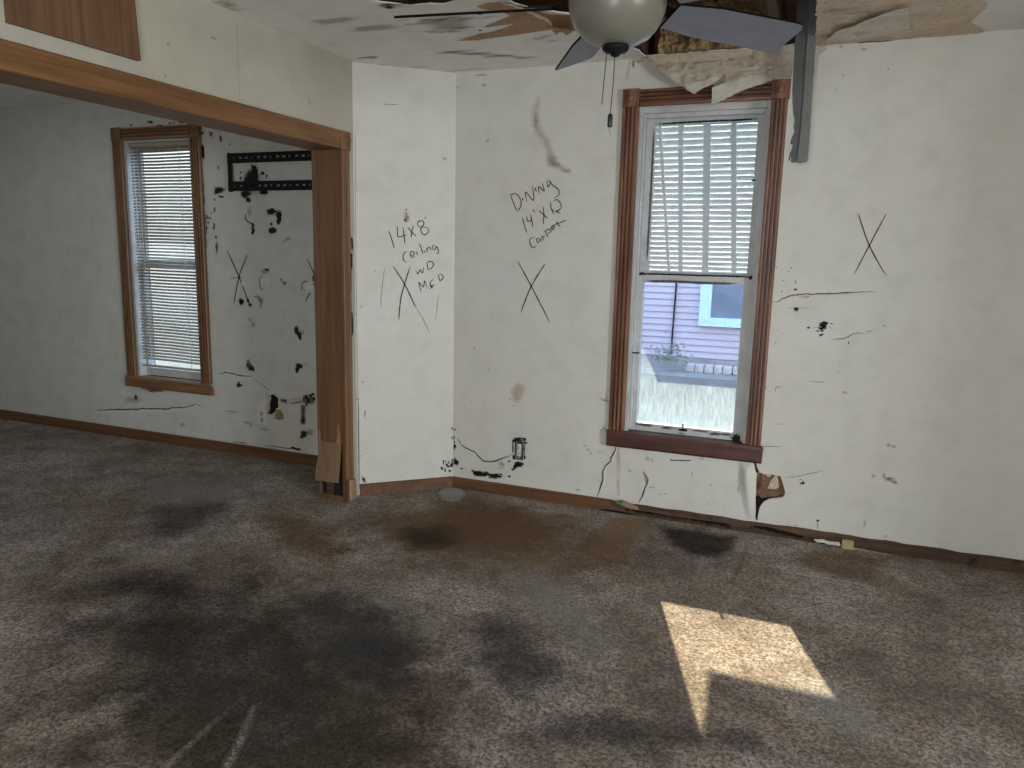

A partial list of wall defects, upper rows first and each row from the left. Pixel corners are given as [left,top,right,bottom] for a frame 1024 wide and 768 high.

flaking render [815,0,988,68]
crack [772,266,876,304]
crack [94,404,204,414]
spalling [255,390,303,420]
crack [639,470,654,504]
spalling [756,472,785,520]